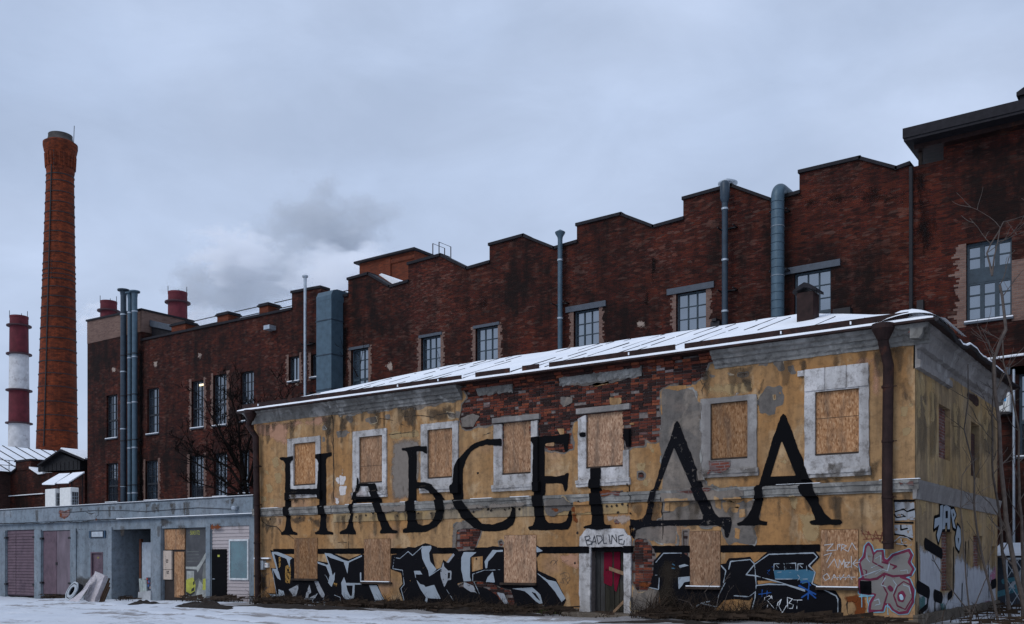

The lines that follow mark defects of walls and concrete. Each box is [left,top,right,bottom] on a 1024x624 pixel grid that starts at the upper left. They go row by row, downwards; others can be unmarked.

flaking render [255,359,796,611]